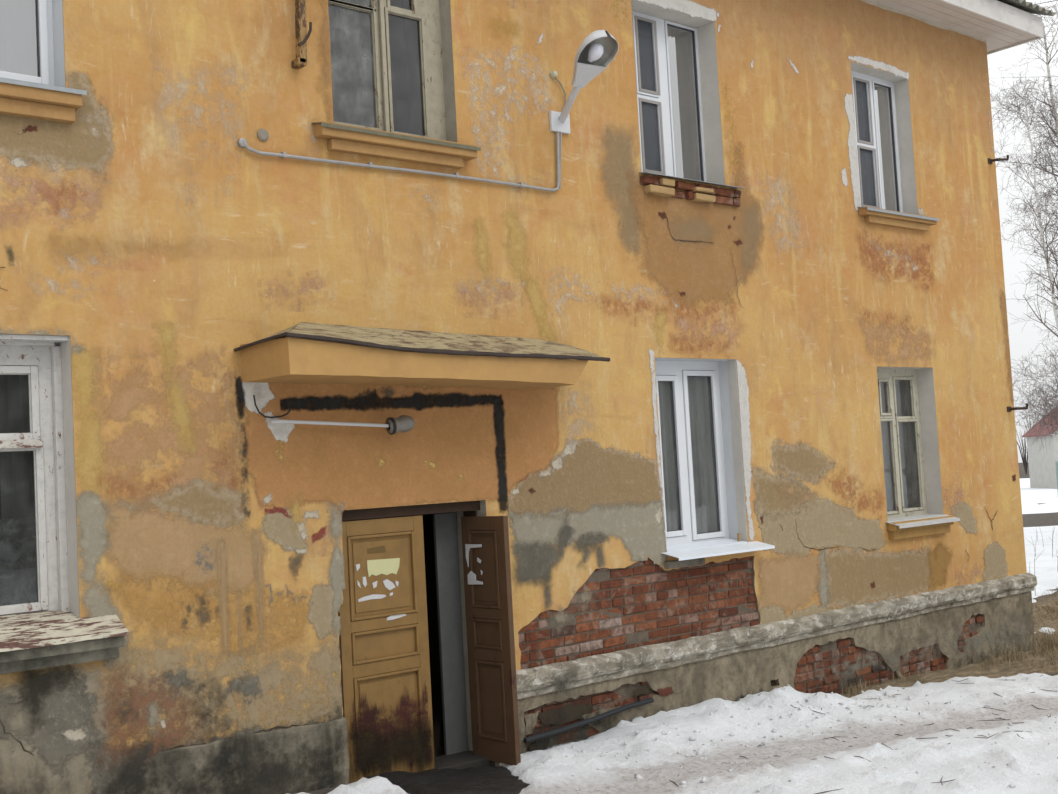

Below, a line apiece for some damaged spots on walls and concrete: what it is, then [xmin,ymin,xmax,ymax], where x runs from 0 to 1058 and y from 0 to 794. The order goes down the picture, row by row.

flaking render [0,73,114,225]
flaking render [76,479,320,620]
flaking render [507,438,662,527]
flaking render [518,467,950,670]
flaking render [794,614,983,694]
water stain [105,735,341,794]